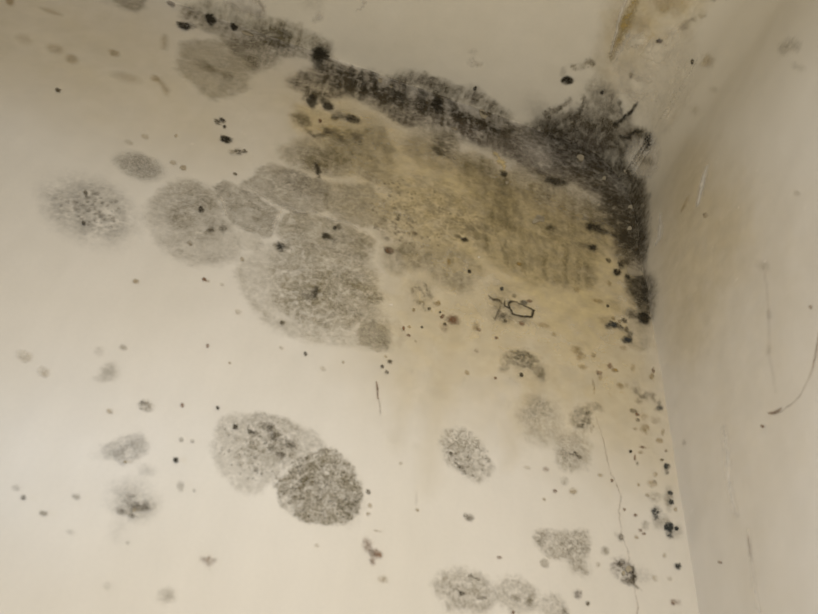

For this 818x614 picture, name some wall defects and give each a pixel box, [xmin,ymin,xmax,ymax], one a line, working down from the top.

damp [177,10,216,29]
damp [225,22,302,65]
damp [282,45,632,350]
damp [248,423,295,456]
damp [279,449,370,524]
damp [614,561,637,587]